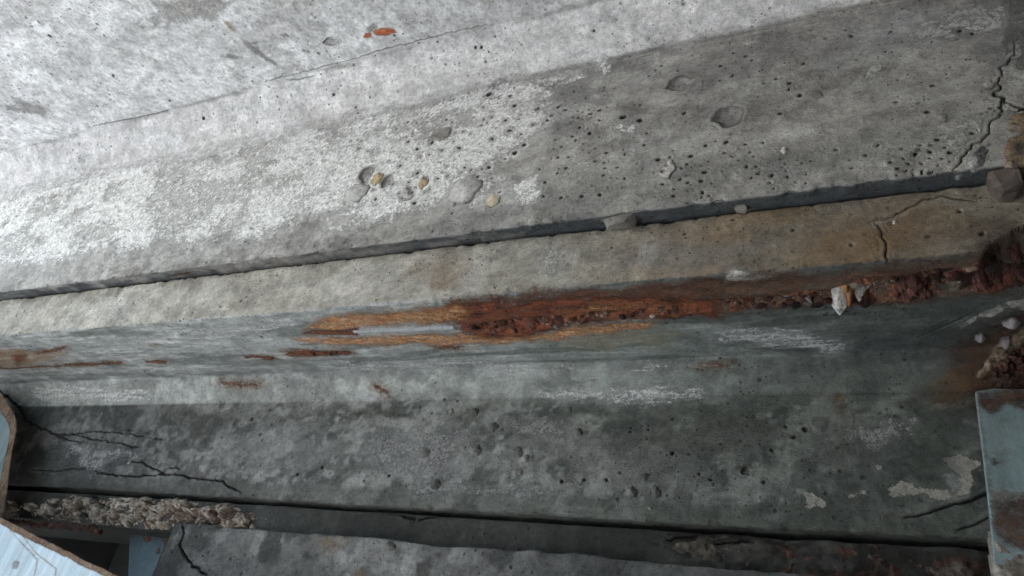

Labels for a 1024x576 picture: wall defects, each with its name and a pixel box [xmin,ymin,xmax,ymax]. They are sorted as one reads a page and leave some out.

rust [363,25,396,38]
crack [864,41,1024,265]
spalling [712,224,1024,312]
spalling [471,303,692,334]
rust [244,253,1024,360]
rust [0,346,122,369]
peeling [976,327,1024,389]
crack [0,387,243,509]
spalling [2,495,258,535]